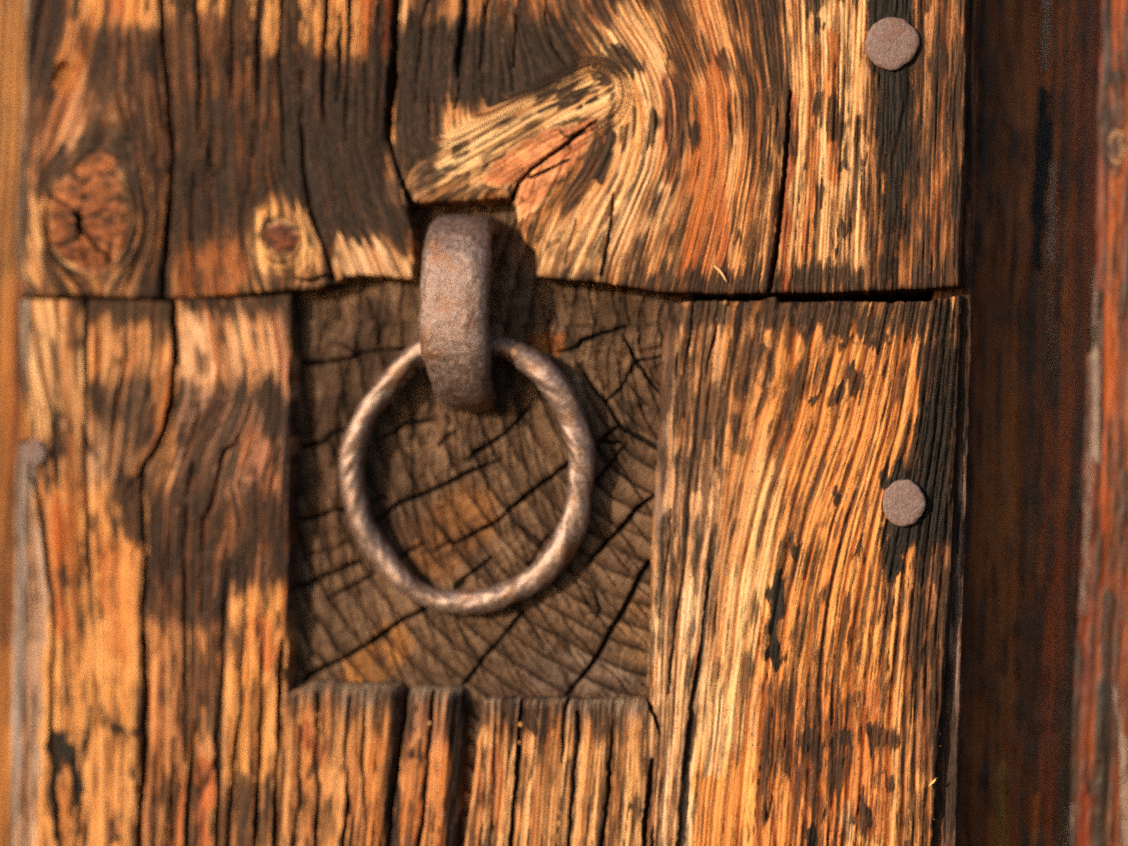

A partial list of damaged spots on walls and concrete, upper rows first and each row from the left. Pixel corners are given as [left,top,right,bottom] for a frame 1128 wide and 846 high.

crack [512,0,567,69]
crack [509,119,598,202]
crack [564,218,577,265]
crack [600,193,614,276]
crack [26,0,530,846]
crack [556,304,722,483]
crack [398,460,569,590]
crack [560,493,714,846]